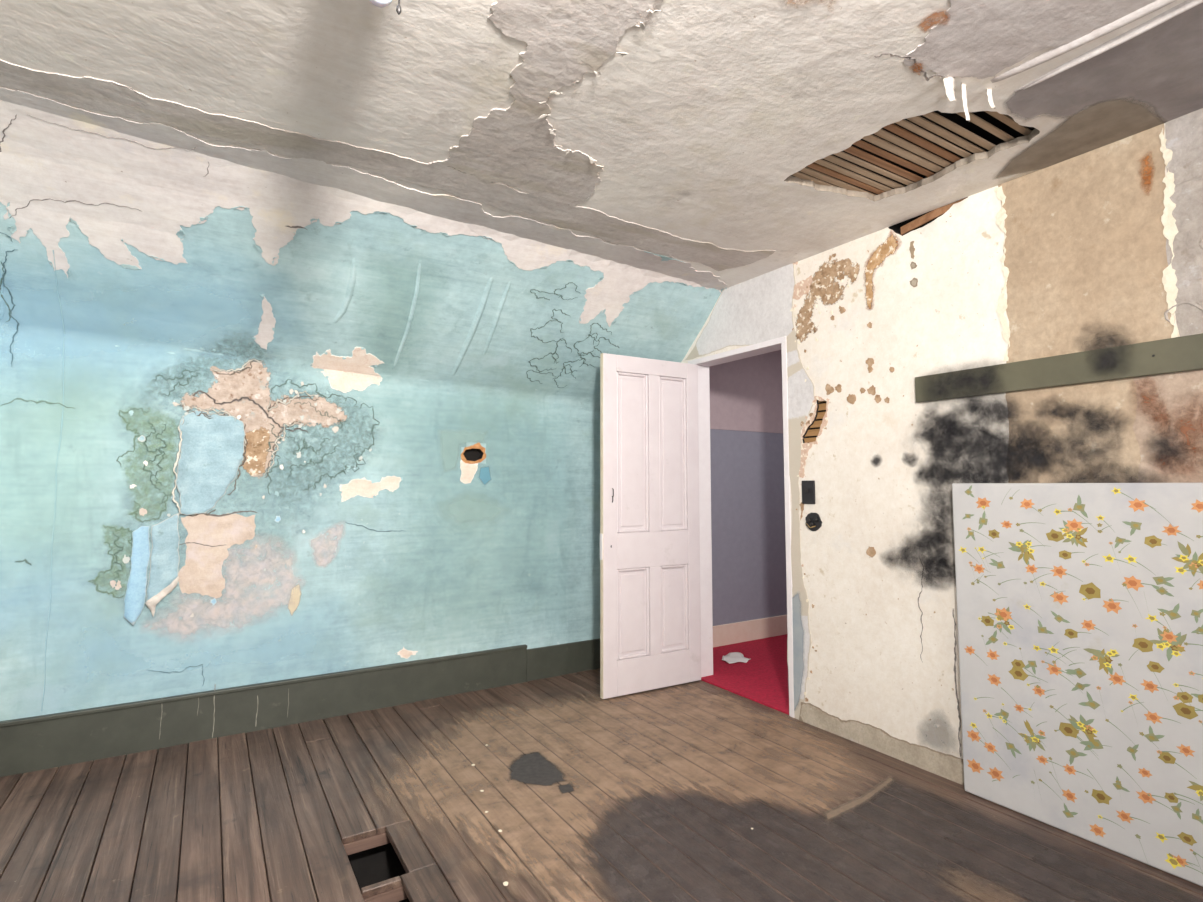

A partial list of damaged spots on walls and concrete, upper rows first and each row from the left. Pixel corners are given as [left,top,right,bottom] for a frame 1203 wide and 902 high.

crack [0,114,209,177]
peeling [0,0,775,327]
crack [1,398,73,408]
crack [0,199,140,365]
spalling [173,295,384,495]
spalling [790,253,860,353]
water stain [887,370,1143,584]
spalling [994,123,1174,363]
spalling [1005,370,1203,483]
water stain [1094,334,1122,371]
water stain [1138,382,1203,472]
water stain [587,777,1201,902]